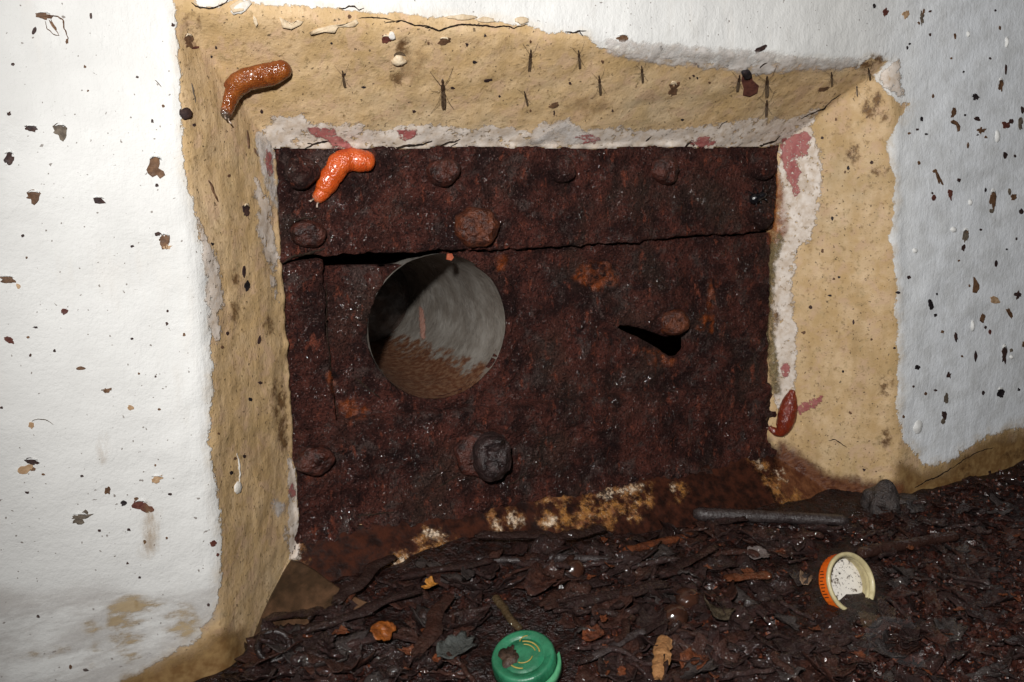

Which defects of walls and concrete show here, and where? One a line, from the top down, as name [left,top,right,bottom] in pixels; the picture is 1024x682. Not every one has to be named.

peeling [184,33,199,49]
peeling [279,14,359,45]
crack [339,5,529,31]
spalling [382,31,407,84]
peeling [601,34,856,97]
peeling [179,107,196,126]
peeling [196,212,229,349]
rust [574,263,616,289]
peeling [798,396,823,415]
peeling [274,455,303,560]
rust [292,442,876,581]